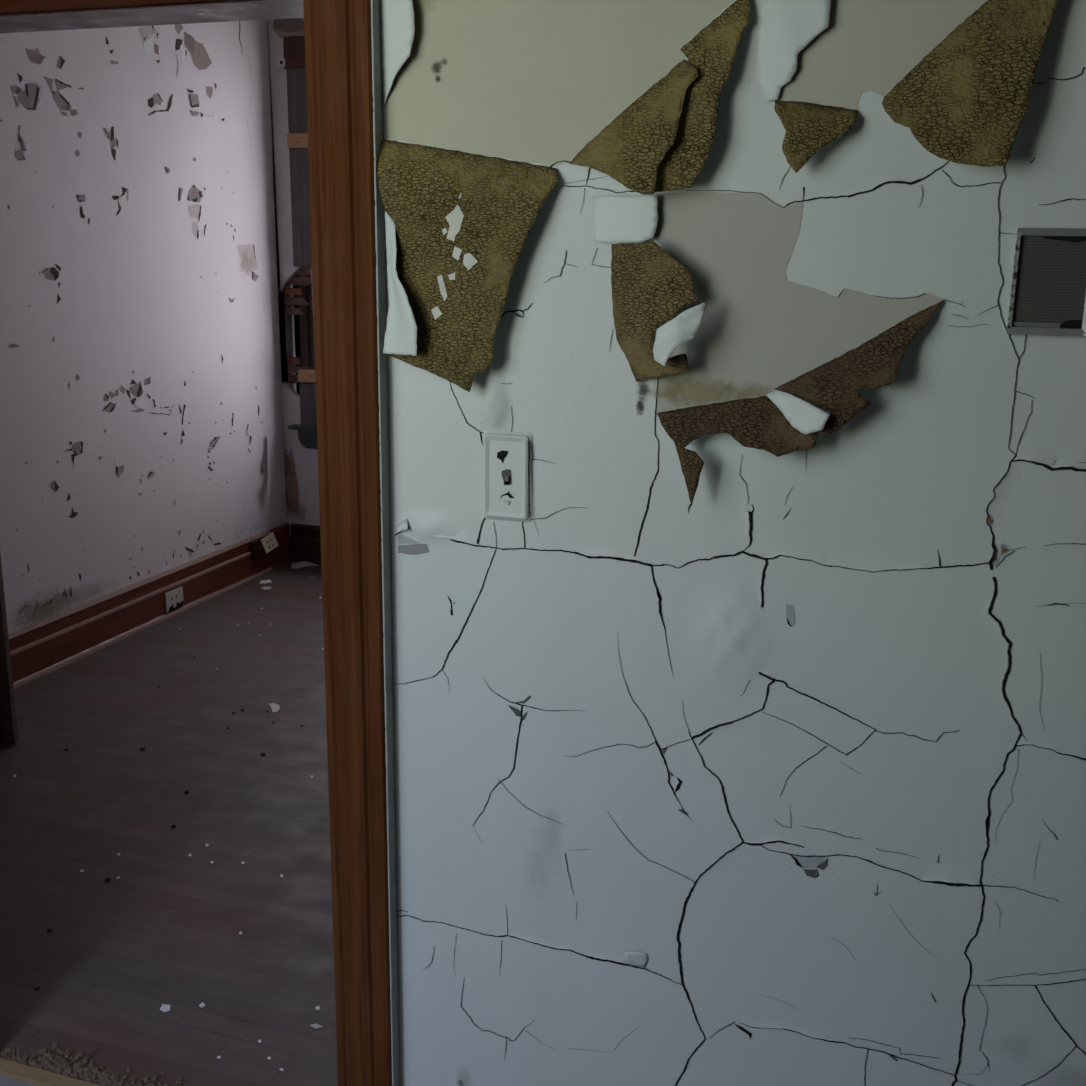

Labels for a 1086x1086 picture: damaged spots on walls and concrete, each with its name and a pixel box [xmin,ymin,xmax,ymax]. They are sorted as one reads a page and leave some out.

peeling [175,24,212,77]
peeling [10,46,83,117]
peeling [148,93,173,116]
peeling [187,82,217,117]
peeling [105,125,118,161]
peeling [178,185,206,238]
flaking render [377,0,1059,506]
peeling [40,264,61,304]
peeling [102,371,190,444]
peeling [57,441,83,466]
peeling [207,406,263,484]
crack [390,160,1086,1086]